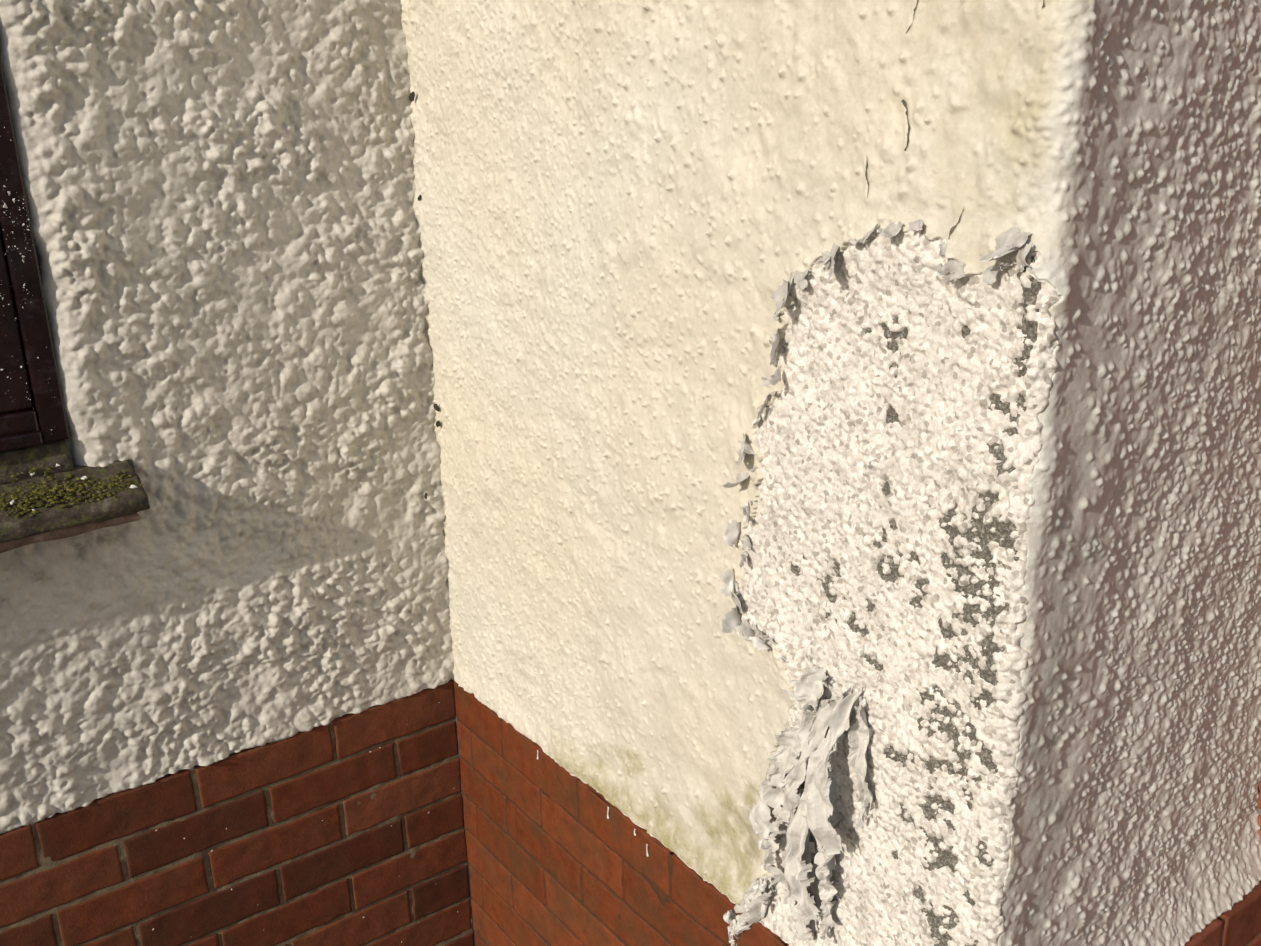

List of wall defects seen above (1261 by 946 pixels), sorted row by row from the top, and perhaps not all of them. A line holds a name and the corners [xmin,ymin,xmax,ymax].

crack [901,100,910,151]
peeling [717,219,1061,946]